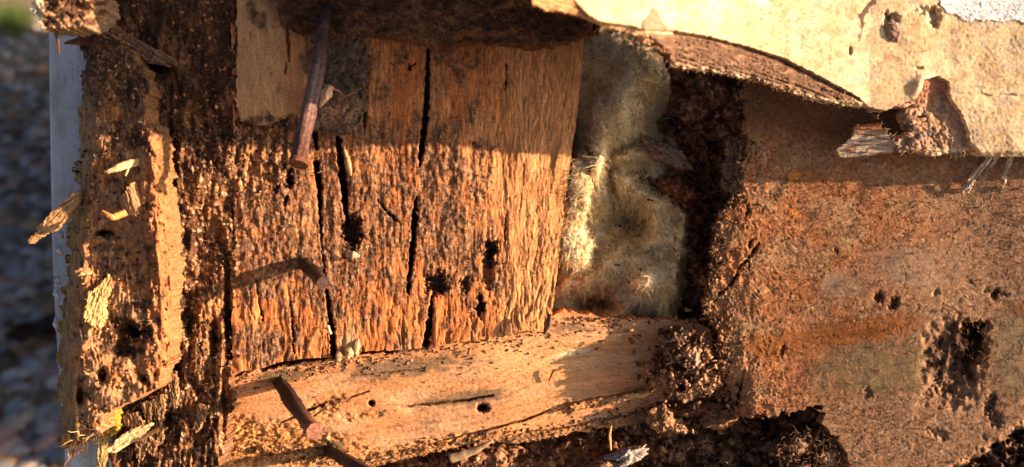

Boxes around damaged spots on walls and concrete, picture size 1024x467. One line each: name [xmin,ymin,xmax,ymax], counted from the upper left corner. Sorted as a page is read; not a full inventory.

crack [418,50,430,166]
peeling [866,77,973,157]
crack [382,199,433,347]
crack [326,290,337,361]
corrosion [745,317,916,355]